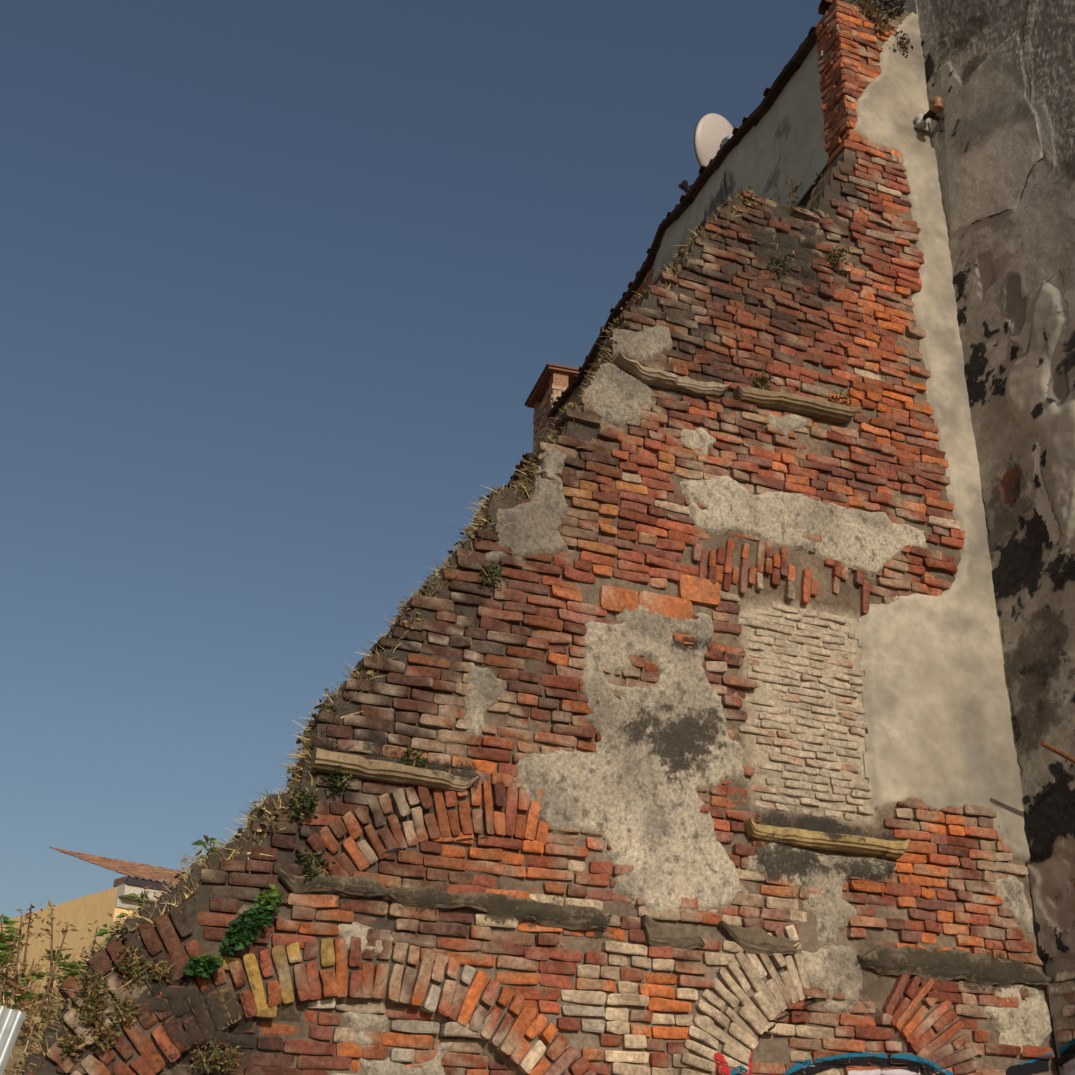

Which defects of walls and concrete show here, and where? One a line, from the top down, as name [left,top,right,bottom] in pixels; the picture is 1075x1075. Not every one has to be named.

crack [1023,1,1033,95]
water stain [704,171,733,219]
crack [937,148,1047,272]
peeling [484,445,568,562]
peeling [581,326,673,427]
peeling [678,427,716,456]
peeling [766,414,807,439]
peeling [680,475,926,580]
peeling [846,12,1075,964]
peeling [463,667,505,737]
peeling [513,602,888,1014]
peeling [984,983,1052,1058]